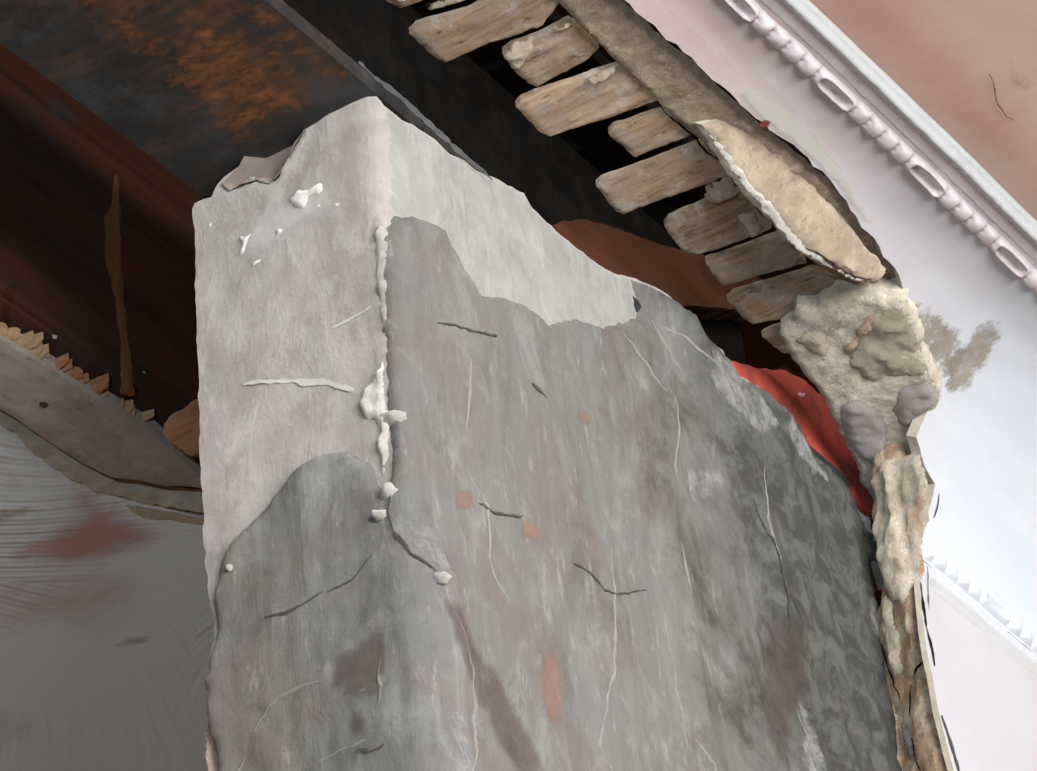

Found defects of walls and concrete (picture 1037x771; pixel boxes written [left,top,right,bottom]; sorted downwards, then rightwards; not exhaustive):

rust [171,28,298,128]
spalling [374,225,388,336]
spalling [557,0,948,771]
spalling [0,410,204,524]
spalling [360,362,407,521]
crack [265,554,373,617]
crack [387,478,436,570]
spalling [433,571,452,586]
crack [881,566,936,771]